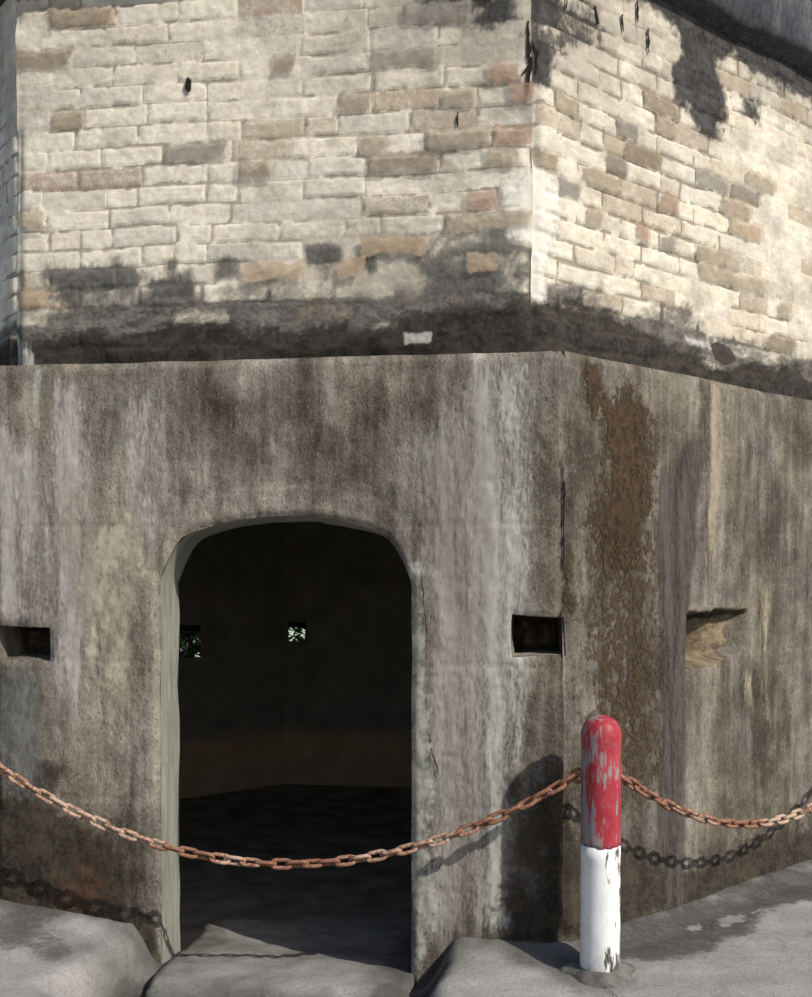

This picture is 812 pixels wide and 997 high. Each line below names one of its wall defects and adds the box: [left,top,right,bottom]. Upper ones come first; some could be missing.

crack [521,21,539,83]
crack [595,0,650,53]
damp [627,0,812,139]
damp [43,258,196,316]
damp [215,256,239,278]
damp [307,243,344,279]
damp [365,255,377,271]
damp [583,361,608,421]
damp [563,383,812,960]